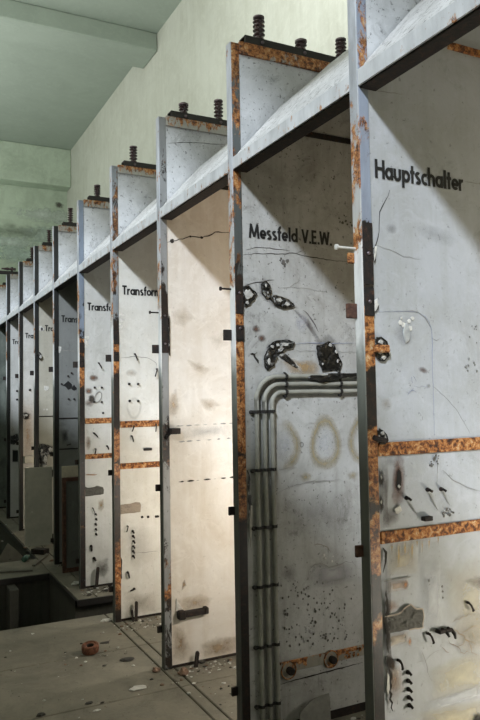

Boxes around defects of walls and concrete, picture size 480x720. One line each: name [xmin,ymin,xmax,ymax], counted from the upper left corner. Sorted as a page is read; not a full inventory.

crack [245,247,347,262]
spalling [243,280,295,309]
spalling [264,340,298,371]
spalling [316,341,342,372]